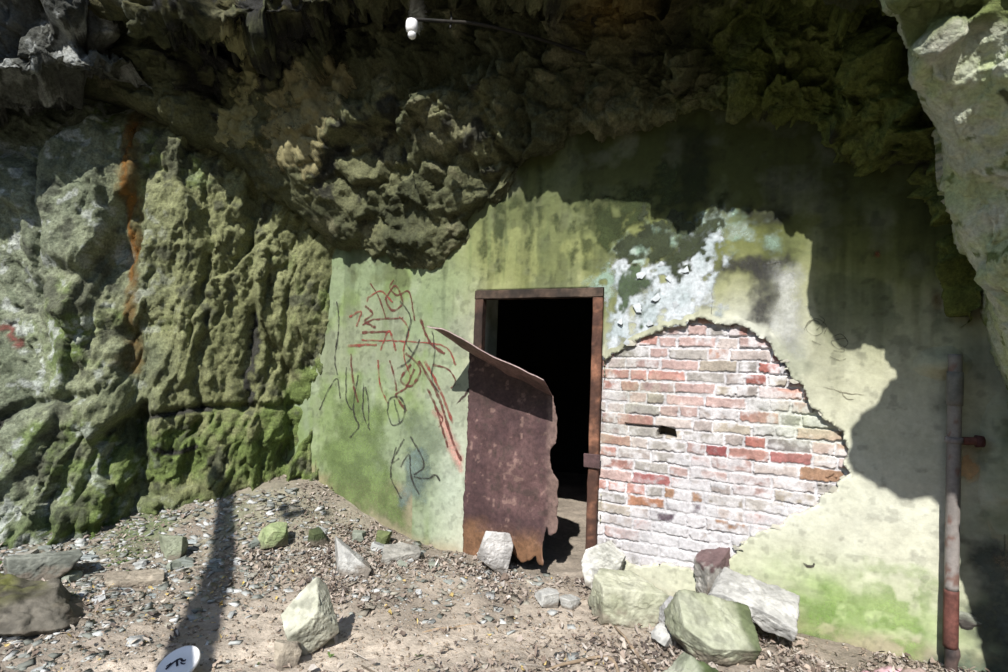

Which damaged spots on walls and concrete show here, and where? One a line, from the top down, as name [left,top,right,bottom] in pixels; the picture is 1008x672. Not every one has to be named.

water stain [479,197,542,256]
water stain [571,129,728,313]
water stain [751,266,797,341]
spalling [594,212,849,570]
rust [942,587,960,651]